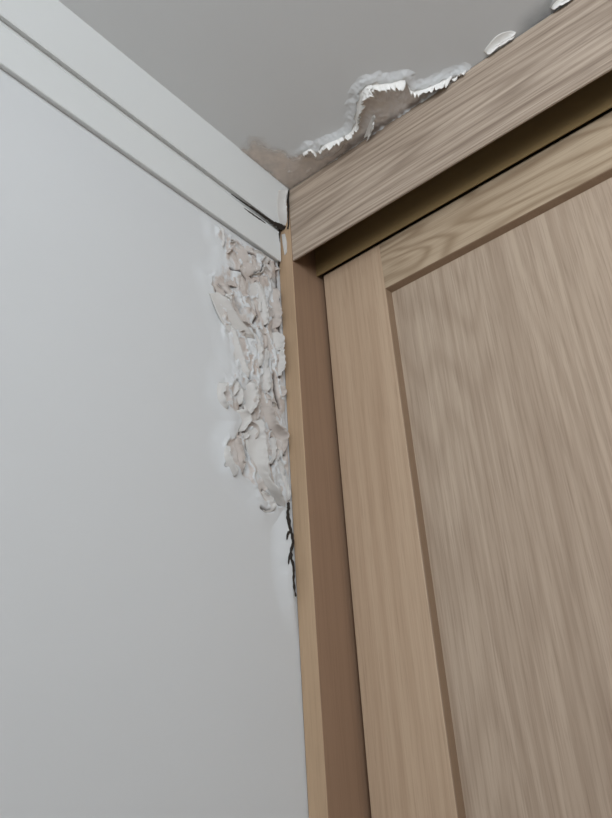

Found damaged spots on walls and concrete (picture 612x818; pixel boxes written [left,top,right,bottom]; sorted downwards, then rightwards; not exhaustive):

peeling [483,31,516,55]
peeling [549,0,570,10]
peeling [277,62,472,226]
peeling [191,210,293,532]
crack [286,502,297,597]